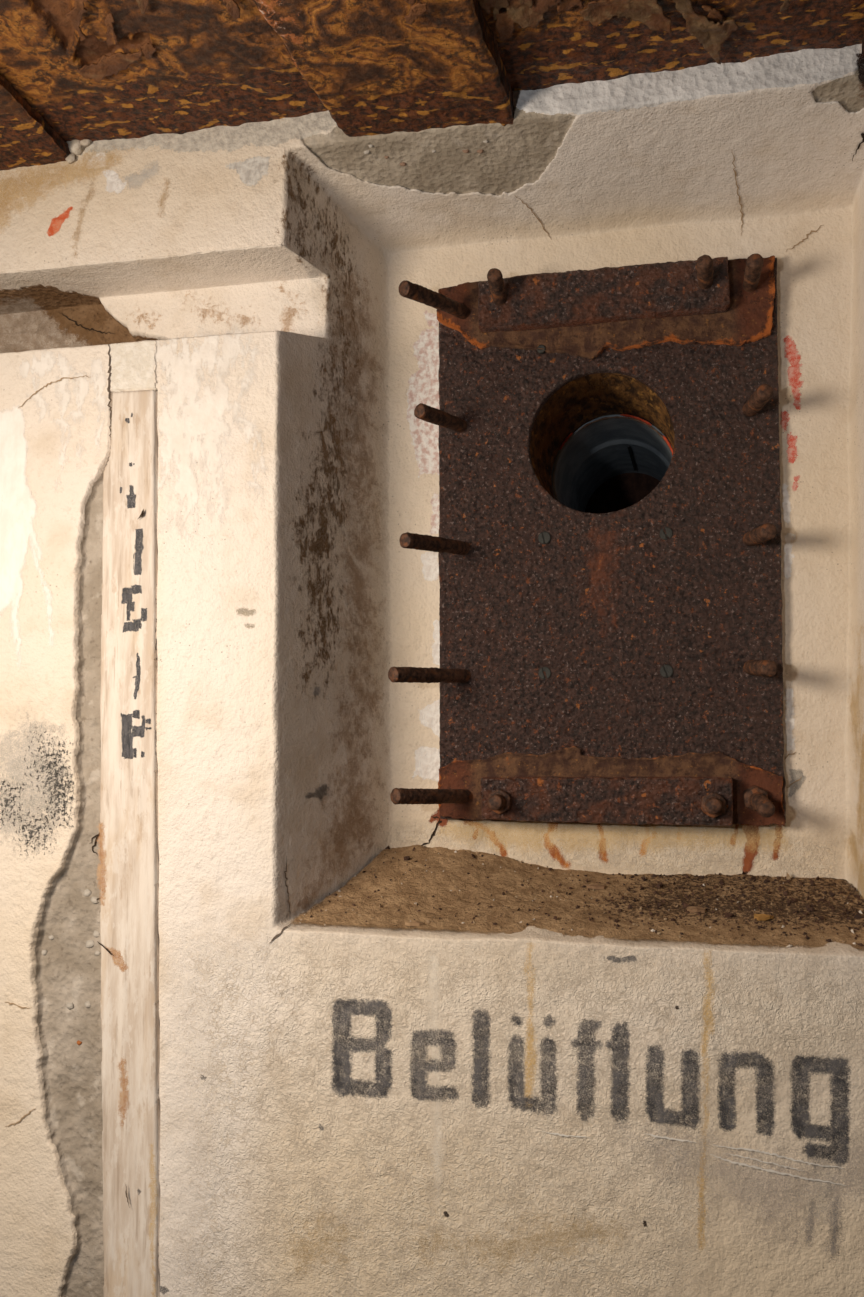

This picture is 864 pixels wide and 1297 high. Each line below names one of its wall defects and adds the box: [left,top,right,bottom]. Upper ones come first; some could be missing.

corrosion [478,0,561,41]
corrosion [580,0,739,64]
spalling [812,68,864,112]
corrosion [856,53,864,97]
spalling [302,106,576,195]
leakage [270,148,397,927]
leakage [0,703,75,861]
corrosion [429,809,794,874]
spalling [34,456,110,1297]